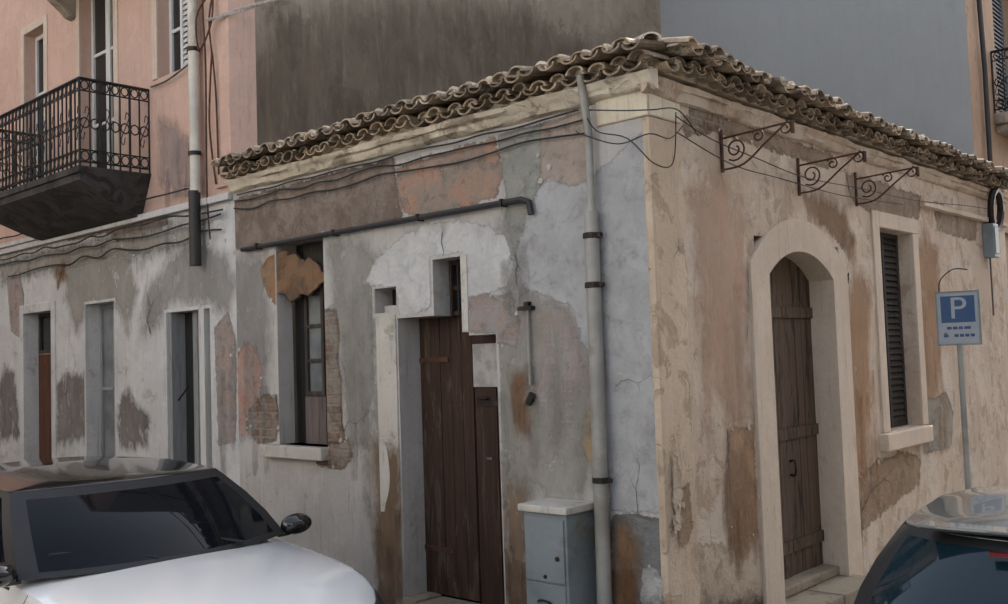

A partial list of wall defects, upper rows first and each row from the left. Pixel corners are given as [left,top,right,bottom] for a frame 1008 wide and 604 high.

peeling [223,112,586,304]
leakage [0,369,20,439]
peeling [7,270,24,337]
leakage [56,373,85,445]
peeling [67,210,168,330]
leakage [118,390,149,449]
peeling [145,243,280,446]
spalling [316,300,353,470]